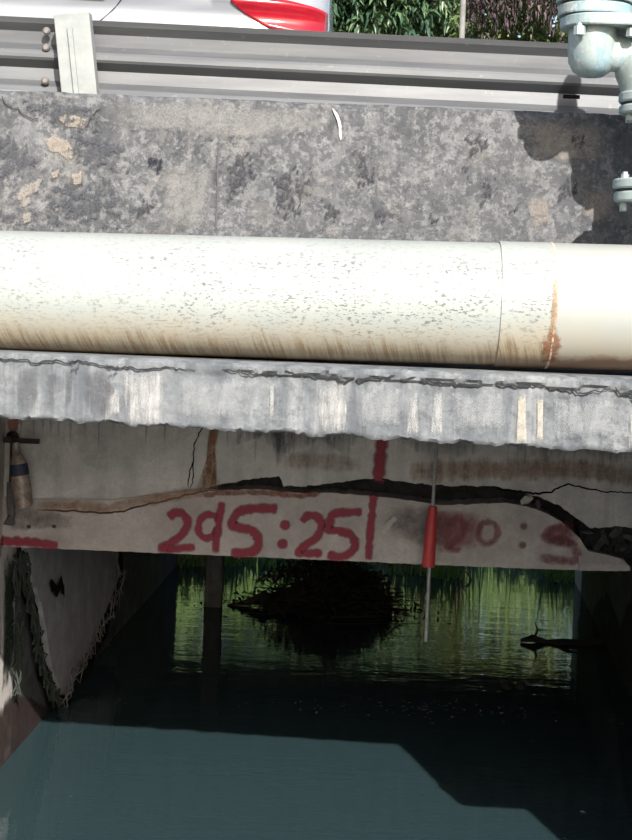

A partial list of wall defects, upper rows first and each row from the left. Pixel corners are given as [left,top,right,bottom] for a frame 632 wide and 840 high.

rust [543,291,561,362]
water stain [183,380,251,414]
water stain [362,390,398,423]
water stain [457,395,501,425]
water stain [517,398,526,440]
water stain [558,402,612,436]
water stain [254,432,295,453]
crack [43,428,225,514]
rust [144,429,317,504]
crack [497,483,632,495]
spalling [573,518,632,559]